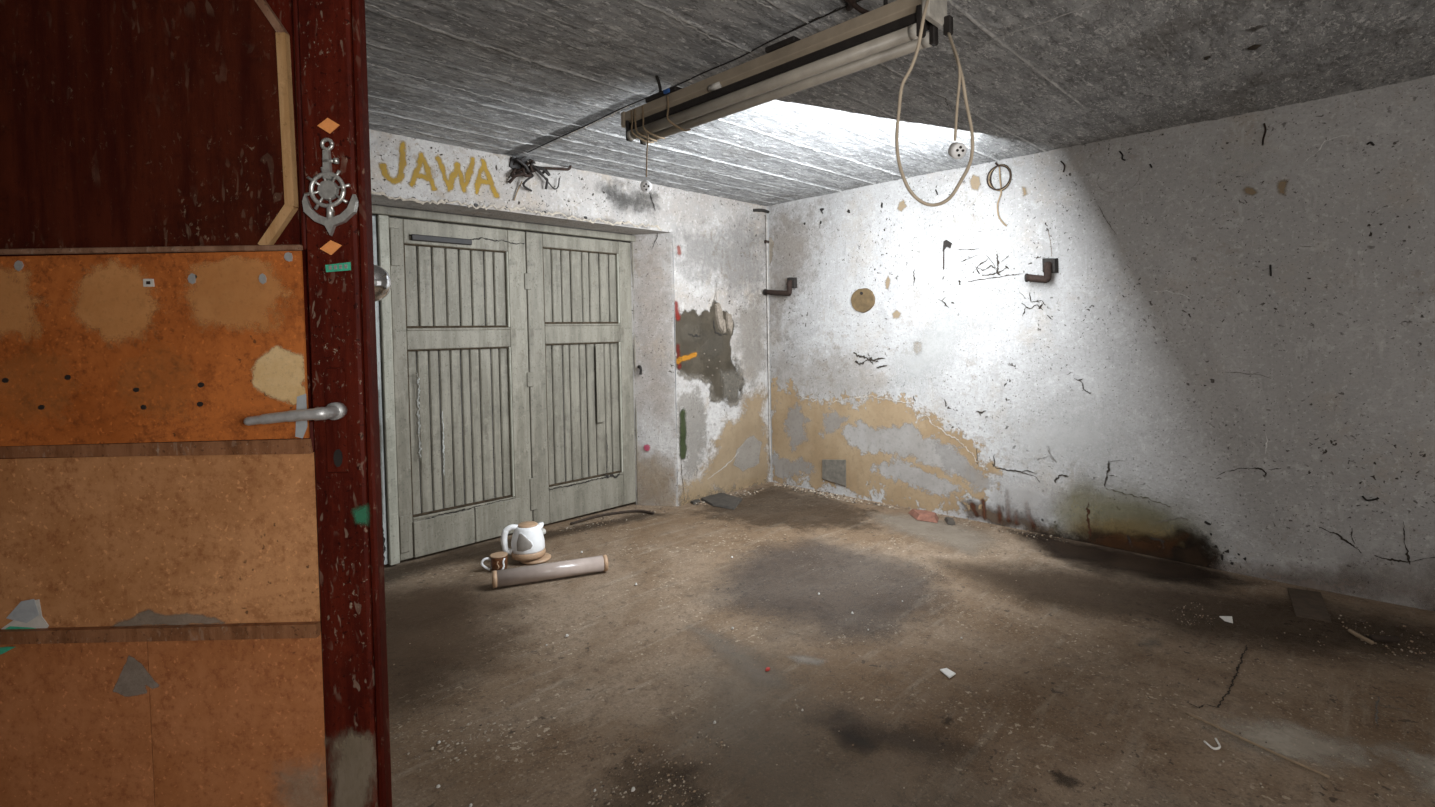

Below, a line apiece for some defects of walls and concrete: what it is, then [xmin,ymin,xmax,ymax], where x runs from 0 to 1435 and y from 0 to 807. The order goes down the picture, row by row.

peeling [675,300,1003,515]
leakage [961,488,1435,658]